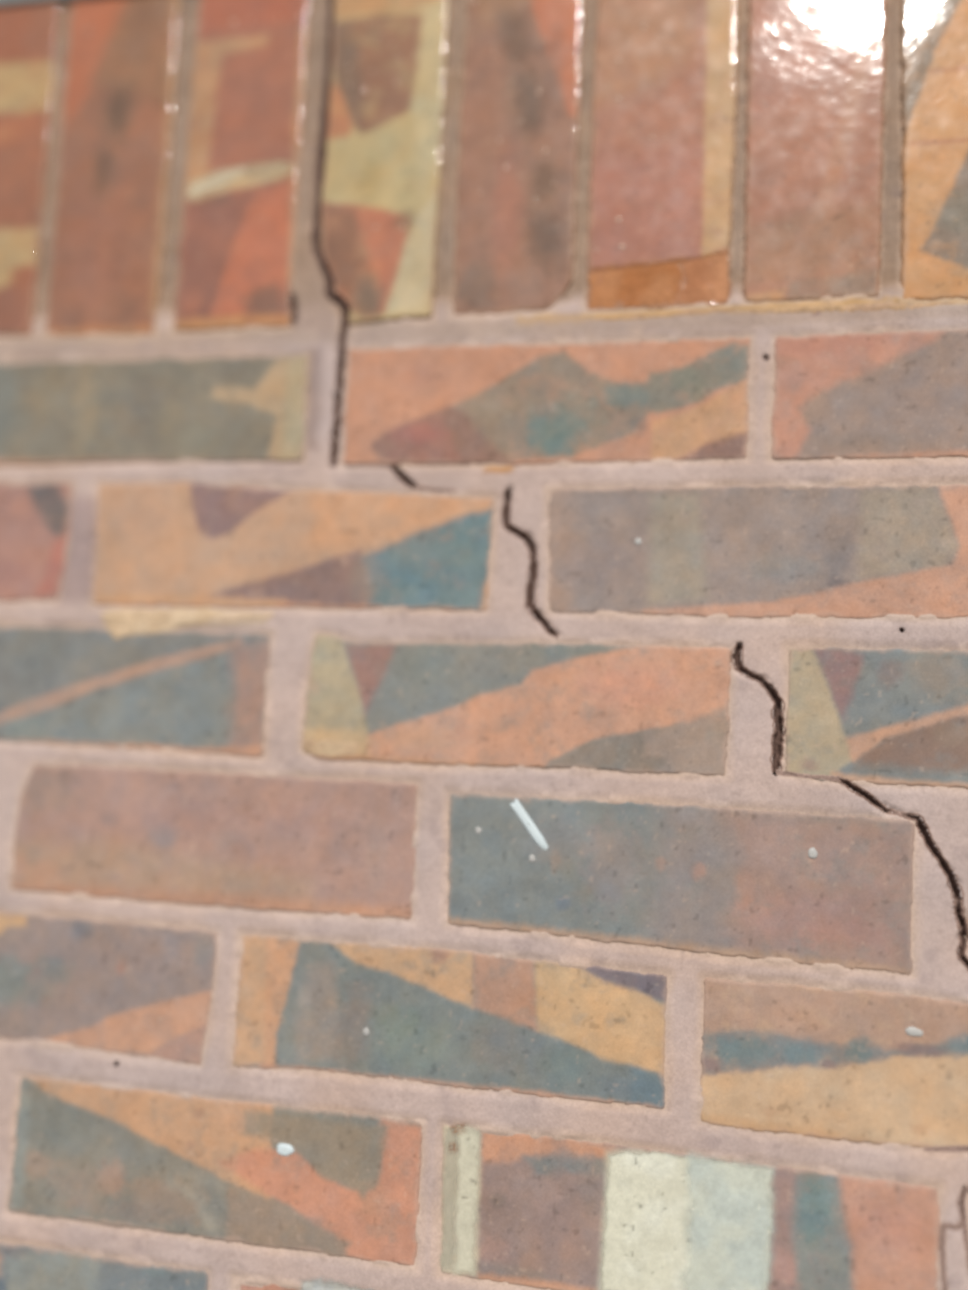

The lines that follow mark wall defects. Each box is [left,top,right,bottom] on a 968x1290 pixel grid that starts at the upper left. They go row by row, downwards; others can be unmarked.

crack [288,0,457,492]
crack [501,489,559,639]
crack [731,644,968,971]